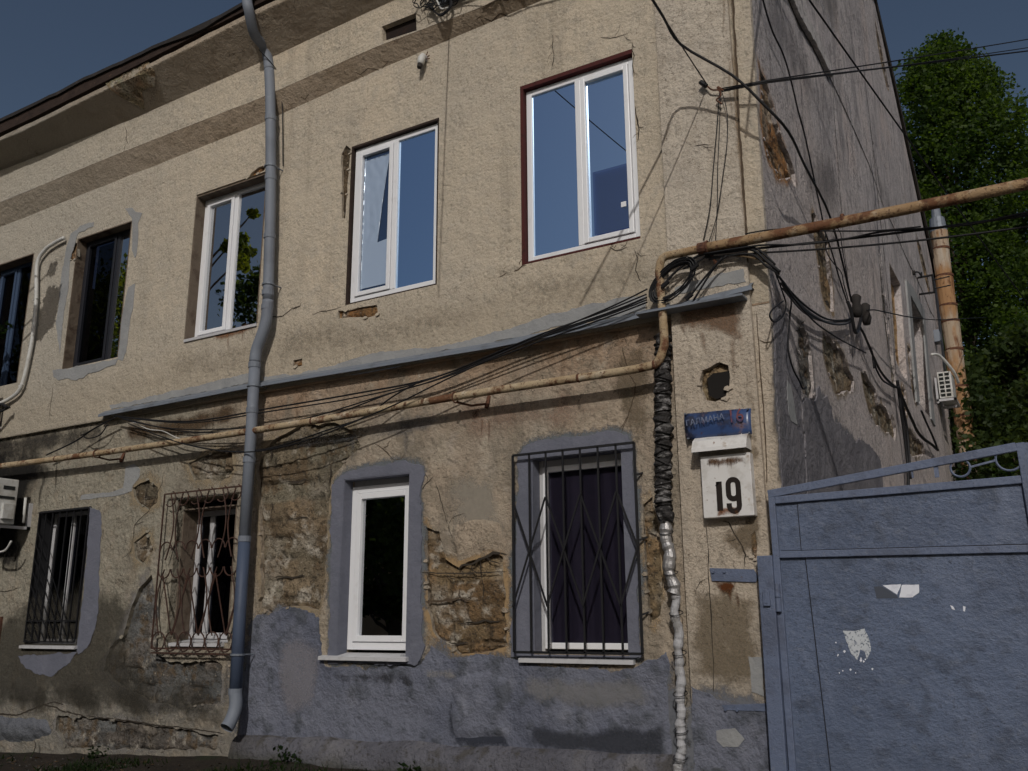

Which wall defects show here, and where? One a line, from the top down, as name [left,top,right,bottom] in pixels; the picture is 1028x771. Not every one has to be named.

flaking render [106,61,155,110]
flaking render [758,62,791,185]
flaking render [340,306,380,319]
flaking render [811,209,834,316]
flaking render [797,321,894,438]
flaking render [130,473,161,512]
flaking render [185,446,238,487]
flaking render [254,414,363,617]
flaking render [53,528,244,754]
flaking render [422,520,511,657]